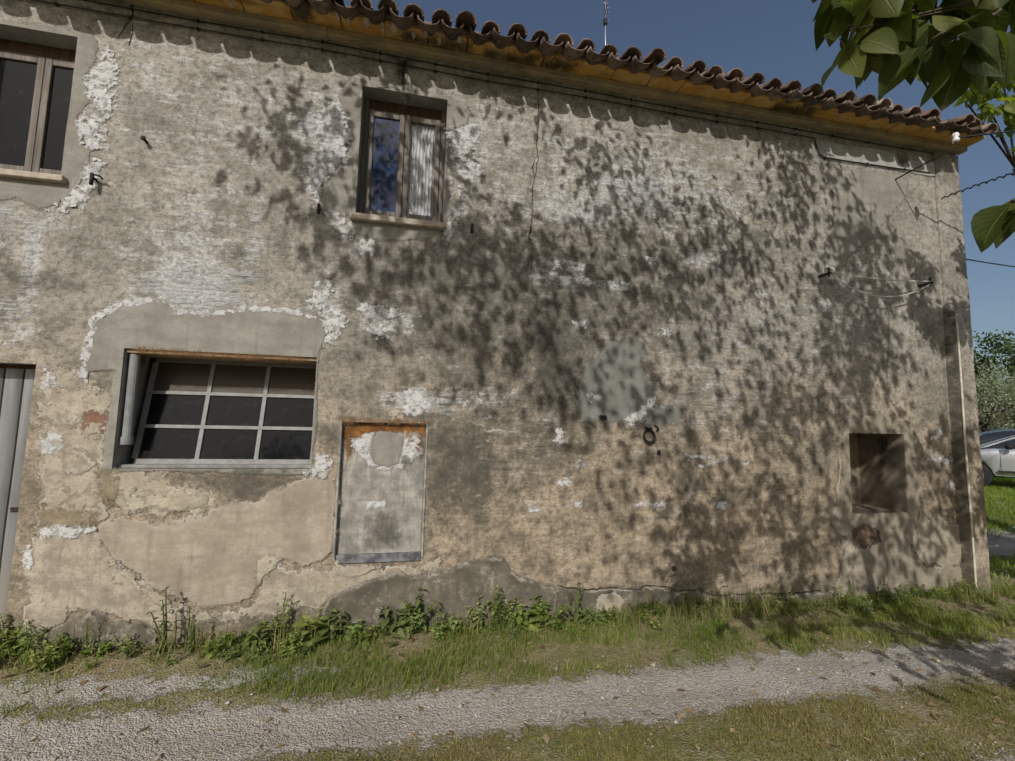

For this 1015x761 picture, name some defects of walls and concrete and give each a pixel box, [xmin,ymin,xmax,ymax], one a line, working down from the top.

peeling [0,44,123,287]
peeling [296,99,381,257]
peeling [442,122,485,245]
crack [528,91,539,291]
peeling [550,259,630,291]
spalling [21,211,450,636]
peeling [624,396,657,426]
spalling [834,525,881,588]